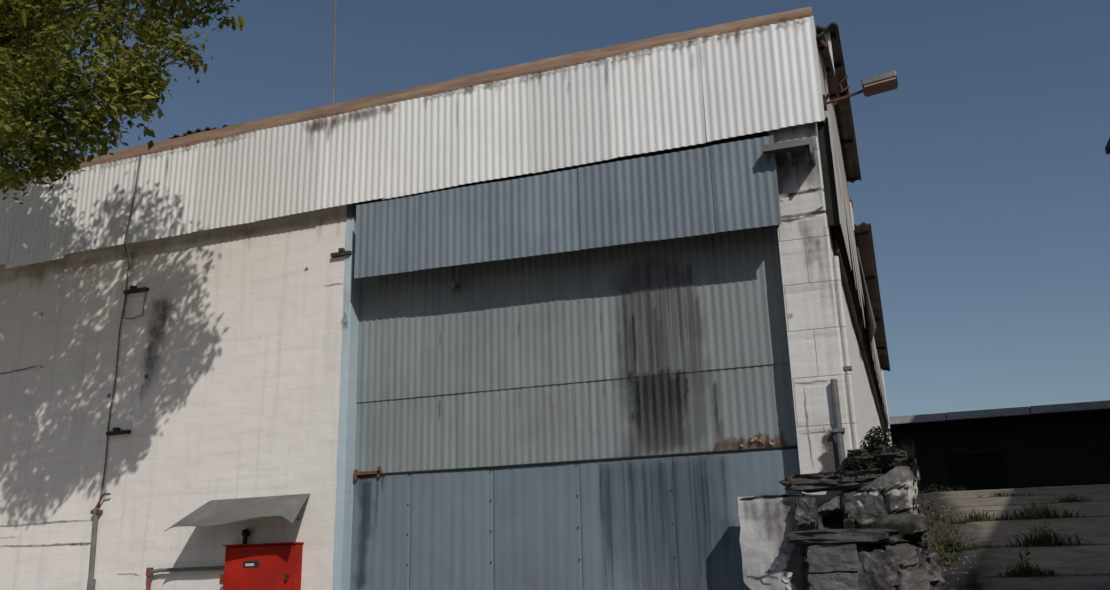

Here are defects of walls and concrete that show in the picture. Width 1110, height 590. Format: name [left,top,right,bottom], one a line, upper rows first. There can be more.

water stain [623,287,688,444]
crack [0,520,91,547]
water stain [358,483,369,587]